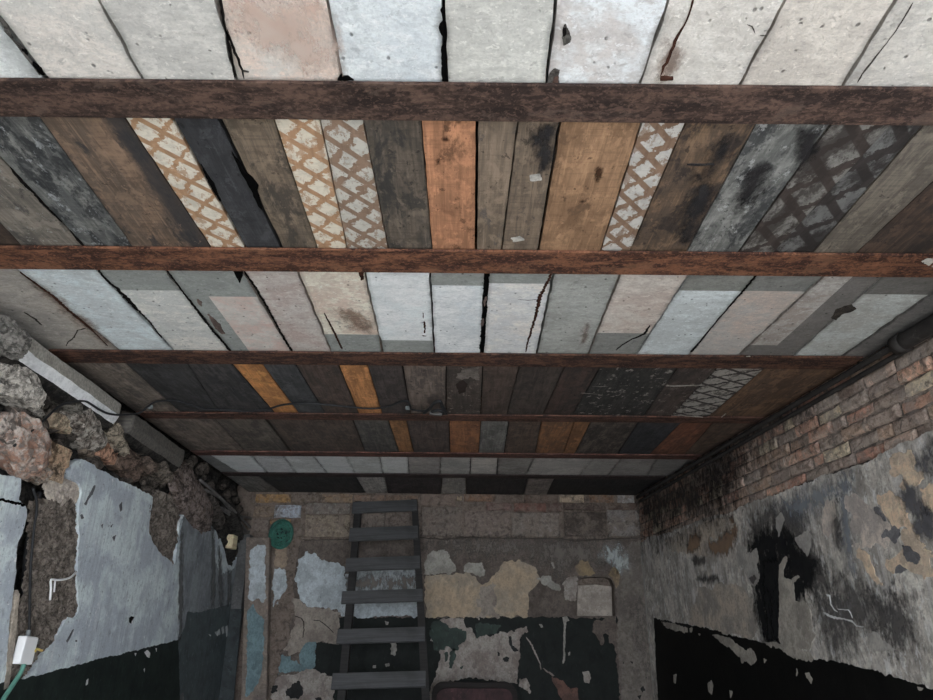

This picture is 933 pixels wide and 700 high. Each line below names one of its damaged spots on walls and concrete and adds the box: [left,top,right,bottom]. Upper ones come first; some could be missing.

crack [660,0,694,76]
crack [857,3,913,83]
crack [232,152,263,210]
crack [518,274,552,352]
crack [690,276,756,352]
spalling [831,304,856,320]
spalling [149,489,181,564]
spalling [212,520,238,566]
spalling [4,478,96,689]
peeling [271,598,341,700]
peeling [424,559,595,700]
peeling [766,556,816,683]